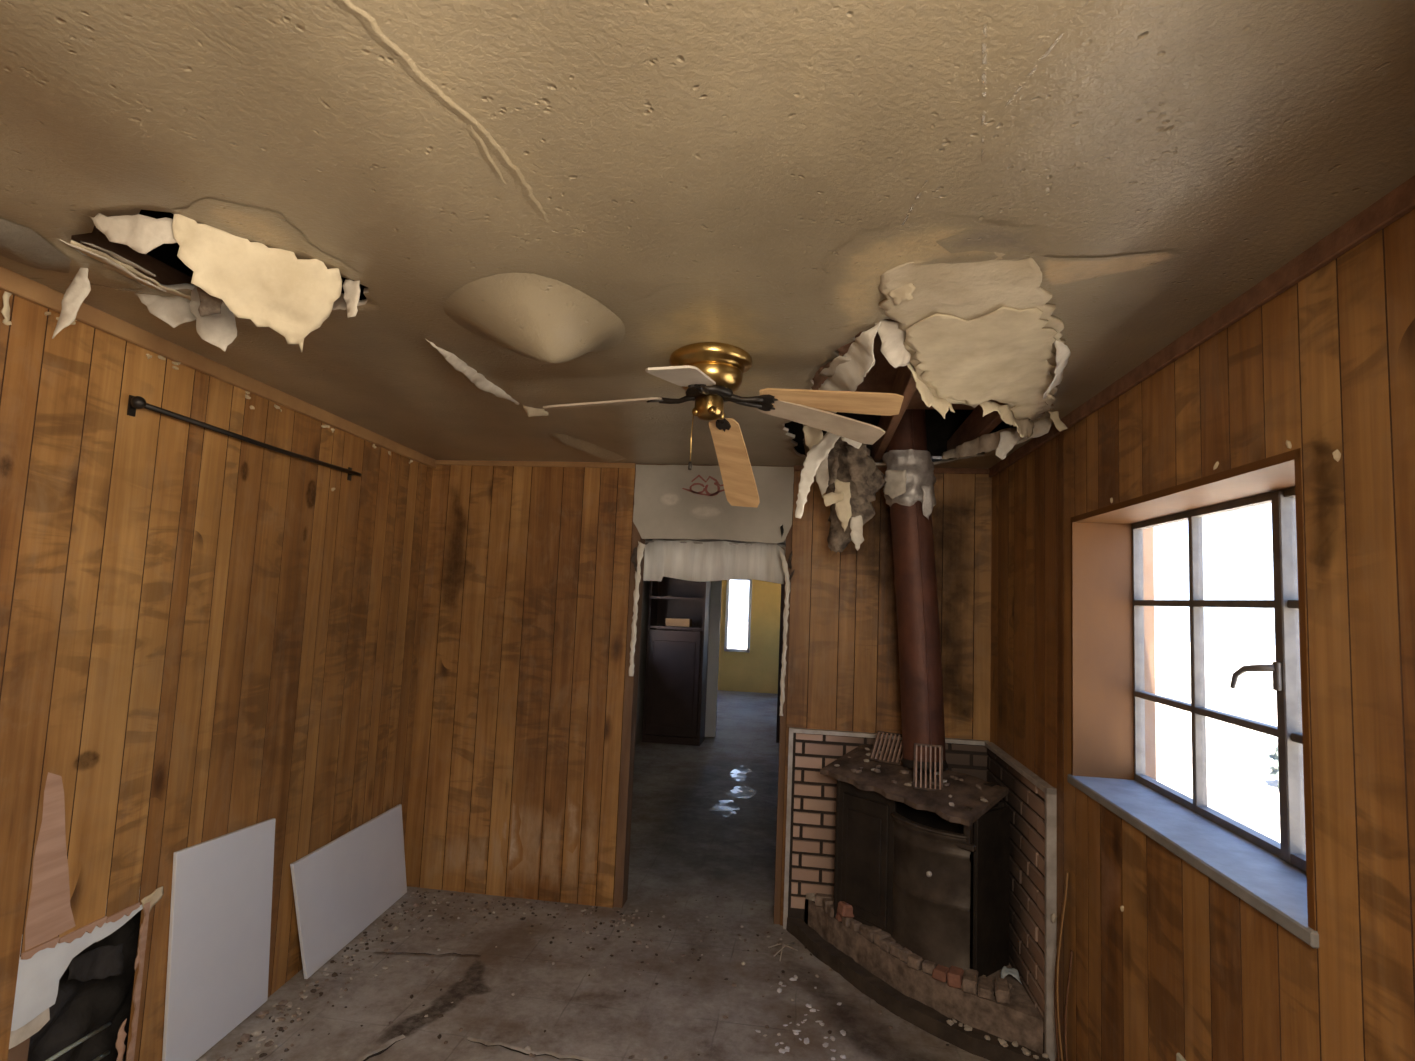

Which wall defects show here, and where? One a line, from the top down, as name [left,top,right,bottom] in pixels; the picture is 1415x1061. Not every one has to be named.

crack [334,0,549,223]
peeling [523,405,549,417]
hole [7,886,164,1061]
crack [354,1035,405,1061]